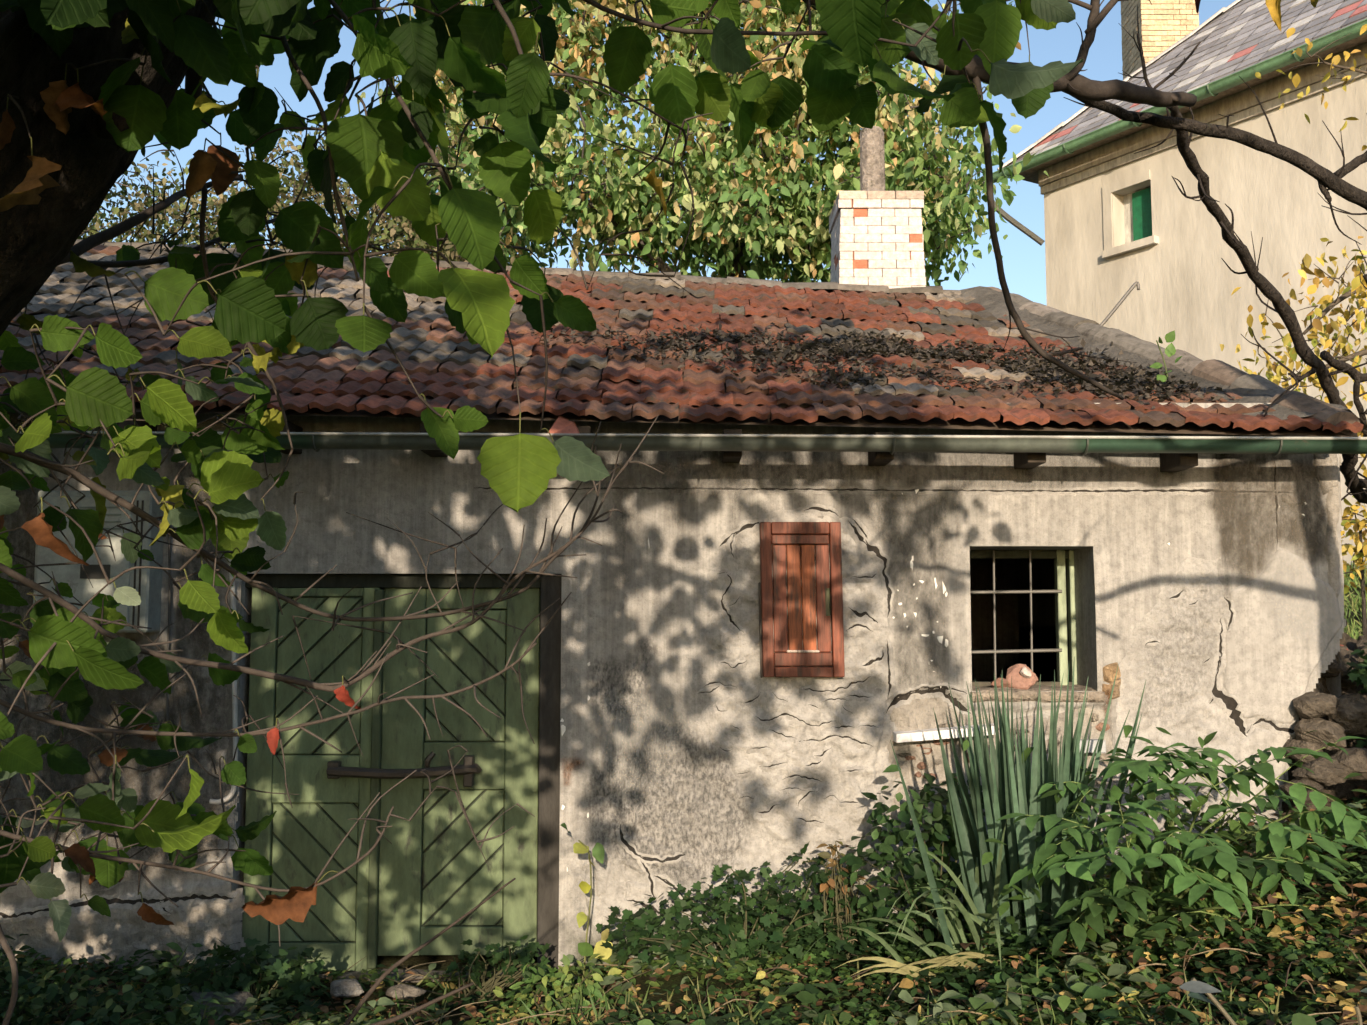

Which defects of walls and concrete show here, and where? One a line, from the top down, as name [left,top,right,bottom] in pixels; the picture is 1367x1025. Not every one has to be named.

damp [1213,453,1326,573]
crack [543,460,1296,827]
peeling [893,556,948,647]
crack [0,890,238,924]
crack [615,824,692,919]